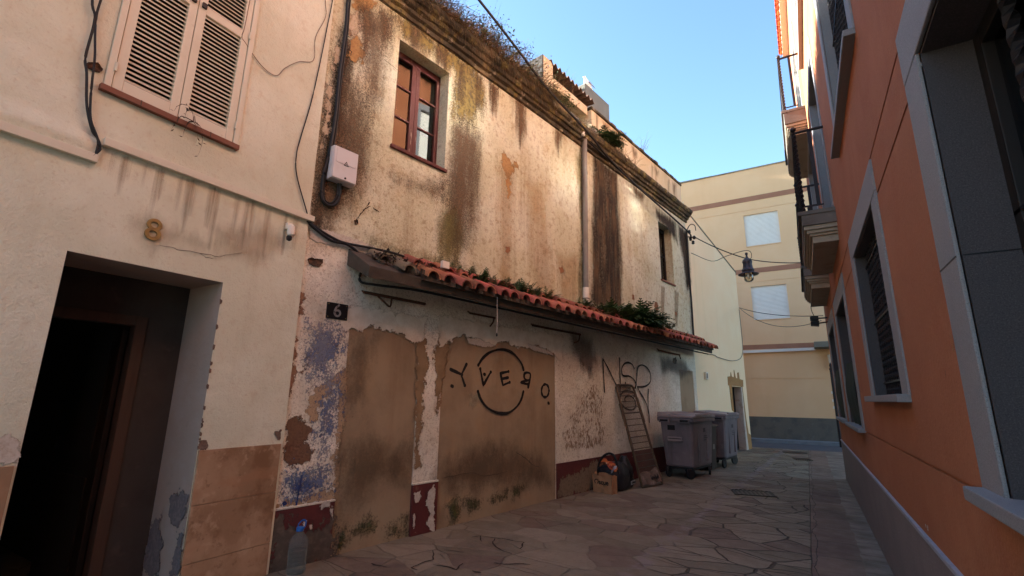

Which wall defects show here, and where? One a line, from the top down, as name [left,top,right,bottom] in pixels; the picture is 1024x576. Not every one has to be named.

flaking render [319,0,378,149]
water stain [312,2,394,228]
water stain [408,120,482,251]
water stain [435,44,499,114]
flaking render [501,150,519,198]
water stain [591,156,622,308]
flaking render [197,406,208,450]
peeling [268,292,566,573]
peeling [142,488,189,576]